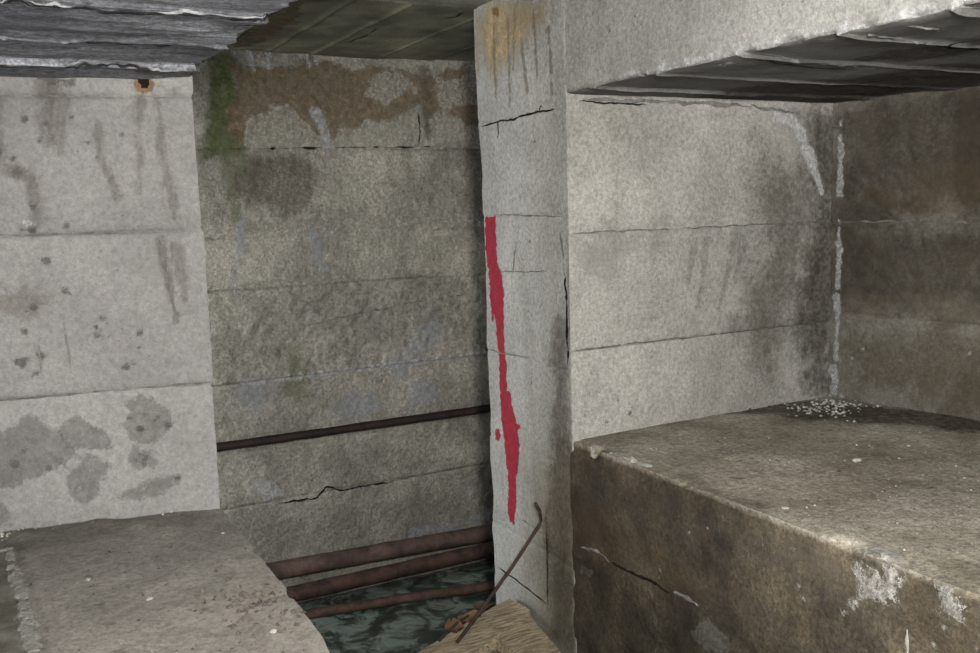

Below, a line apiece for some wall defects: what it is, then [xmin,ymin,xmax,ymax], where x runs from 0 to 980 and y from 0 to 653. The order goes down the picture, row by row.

crack [0,42,190,73]
crack [0,0,268,28]
corrosion [480,1,544,71]
corrosion [134,79,154,93]
water stain [224,0,479,197]
crack [481,105,556,139]
water stain [705,65,980,433]
crack [283,461,491,503]
crack [581,547,698,606]
spalling [841,543,906,617]
spalling [933,582,968,629]